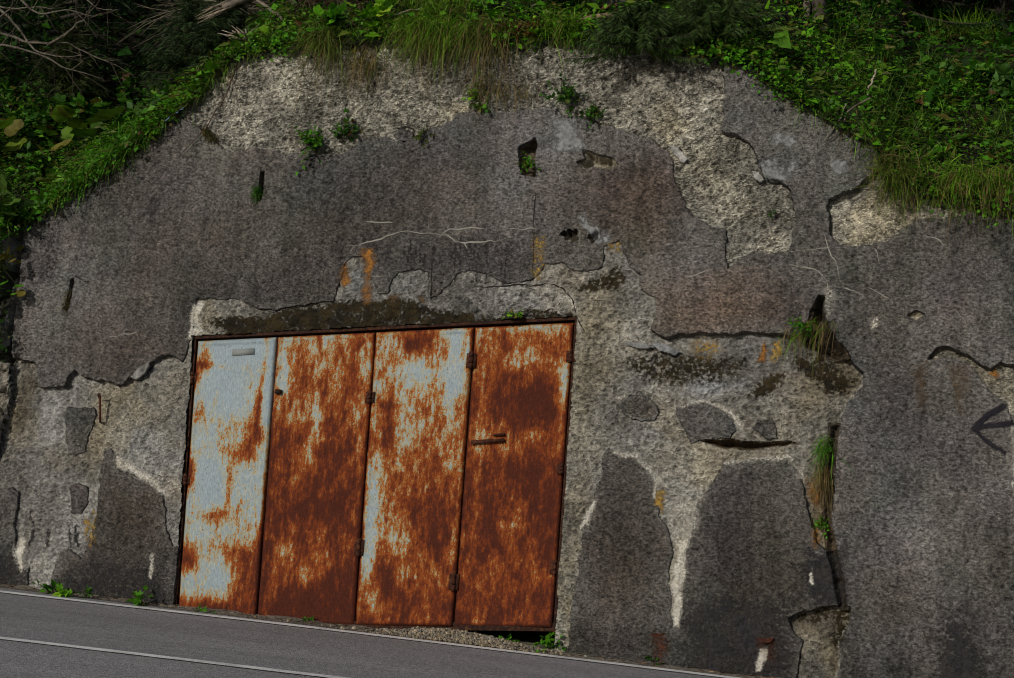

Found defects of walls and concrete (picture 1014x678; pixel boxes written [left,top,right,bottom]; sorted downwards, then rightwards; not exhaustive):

flaking render [176,38,799,269]
leakage [115,454,166,495]
flaking render [0,212,863,678]
leakage [613,451,659,499]
leakage [723,454,803,479]
leakage [580,501,596,529]
leakage [56,555,166,602]
leakage [668,499,794,675]
leakage [806,550,846,605]